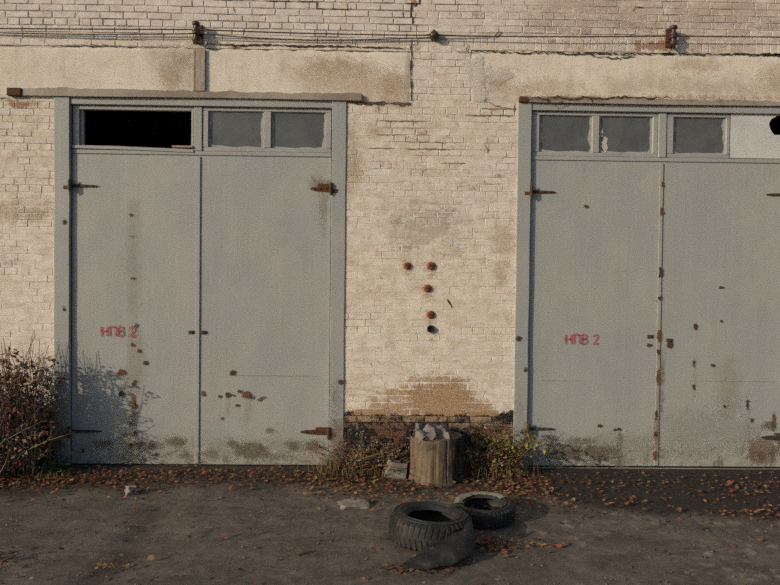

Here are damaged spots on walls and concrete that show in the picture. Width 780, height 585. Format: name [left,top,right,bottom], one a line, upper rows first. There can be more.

crack [206,0,462,164]
corrosion [118,380,137,447]
corrosion [218,390,265,407]
corrosion [647,330,673,460]
corrosion [746,400,780,466]